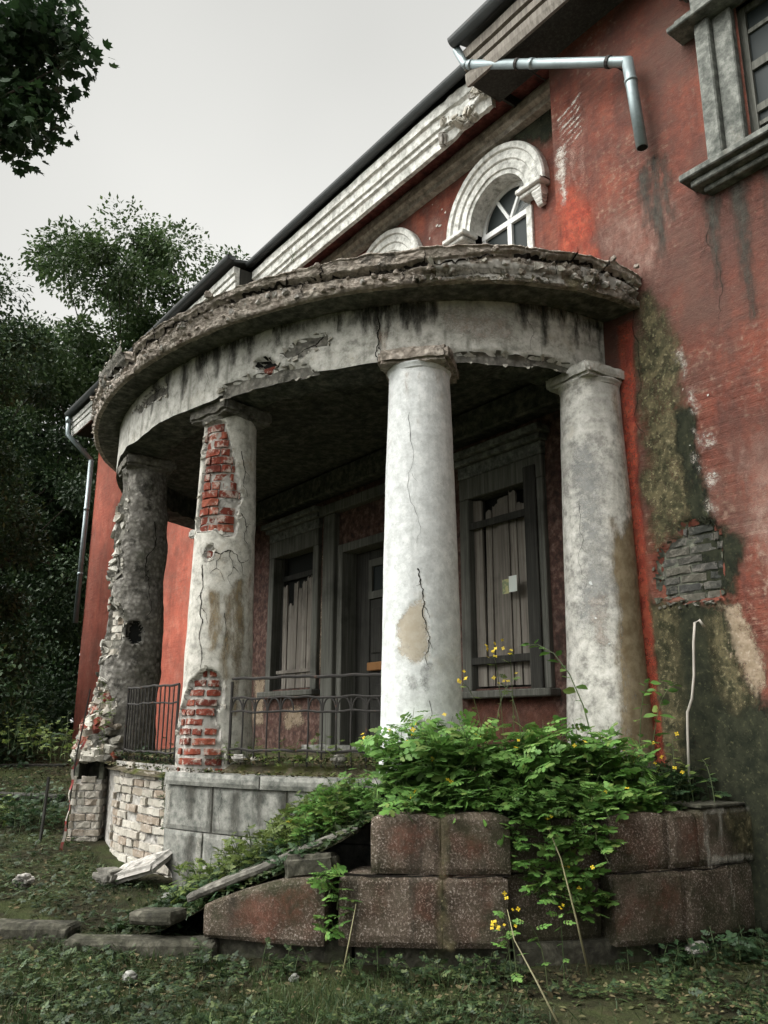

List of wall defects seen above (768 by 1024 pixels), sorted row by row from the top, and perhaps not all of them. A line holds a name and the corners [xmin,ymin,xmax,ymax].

efflorescence [556,145,574,200]
leakage [639,156,669,247]
leakage [151,336,253,409]
spalling [216,332,333,402]
leakage [361,302,511,343]
spalling [194,420,245,562]
spalling [70,473,145,764]
spalling [174,665,228,773]
crack [196,451,251,667]
crack [416,568,432,663]
leakage [611,406,768,939]
spalling [652,502,766,697]